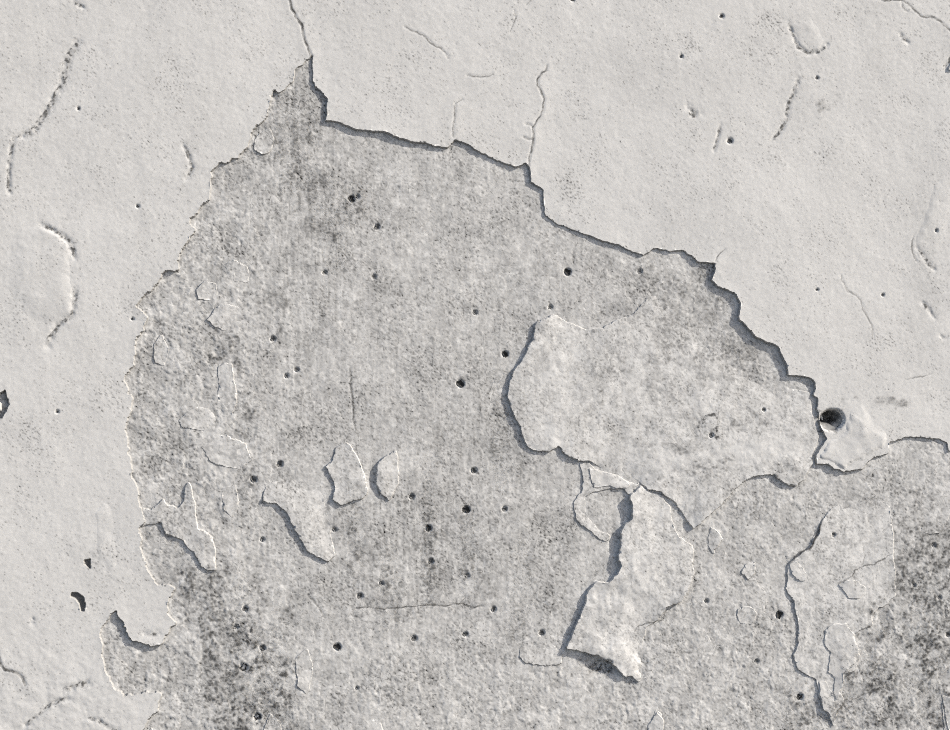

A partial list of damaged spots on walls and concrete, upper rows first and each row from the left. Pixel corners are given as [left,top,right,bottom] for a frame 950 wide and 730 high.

crack [7,43,78,191]
peeling [217,363,237,414]
peeling [201,434,253,469]
peeling [325,442,368,506]
peeling [375,450,400,501]
peeling [506,296,819,529]
peeling [141,482,217,571]
peeling [262,479,335,562]
peeling [519,644,563,666]
peeling [566,485,694,682]
peeling [785,503,896,725]
damp [858,522,950,729]